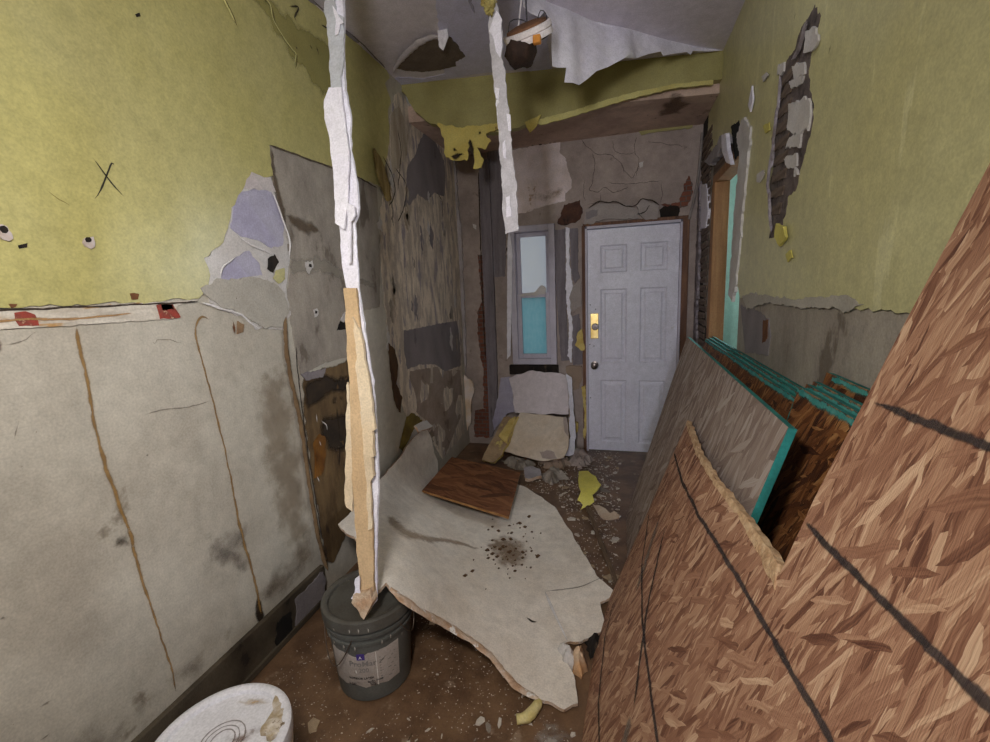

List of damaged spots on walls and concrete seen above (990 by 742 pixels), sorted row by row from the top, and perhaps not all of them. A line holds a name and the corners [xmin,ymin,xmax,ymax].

peeling [395,0,552,85]
peeling [512,142,572,214]
crack [583,137,682,214]
spalling [756,5,821,262]
flaking render [201,87,507,438]
peeling [741,292,864,356]
leakage [195,316,278,621]